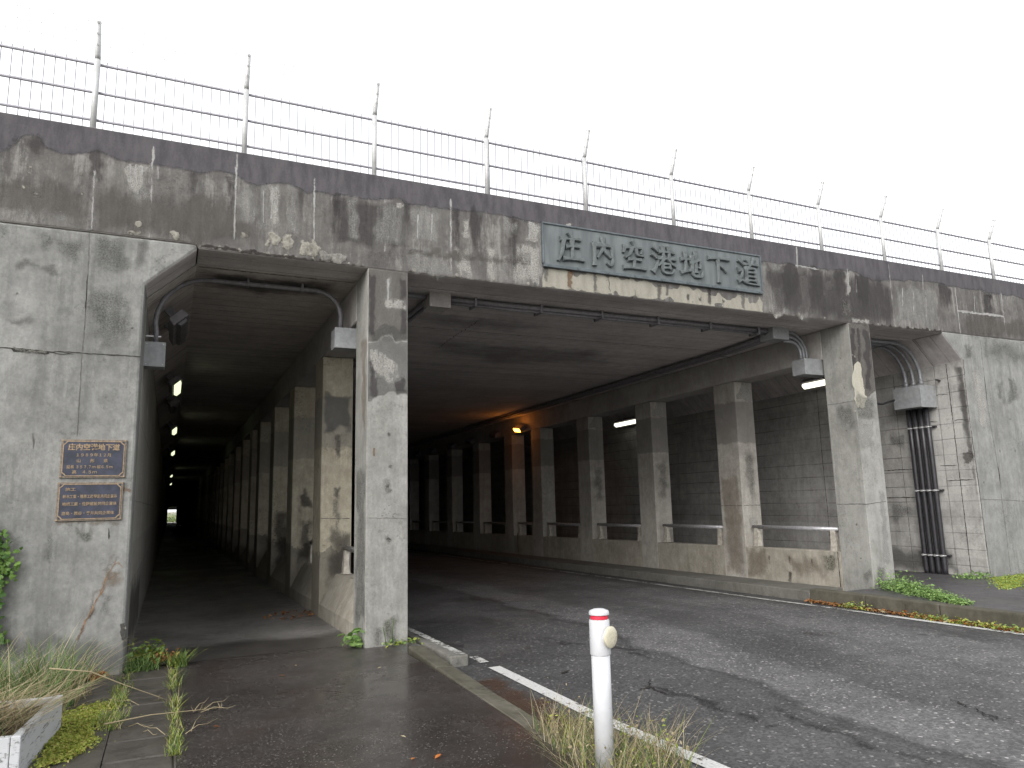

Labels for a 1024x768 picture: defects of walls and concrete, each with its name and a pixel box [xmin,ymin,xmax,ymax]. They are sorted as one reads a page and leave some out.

crack [0,232,141,434]
spalling [199,232,363,267]
water stain [0,112,1024,453]
peeling [852,354,869,412]
crack [79,528,135,636]